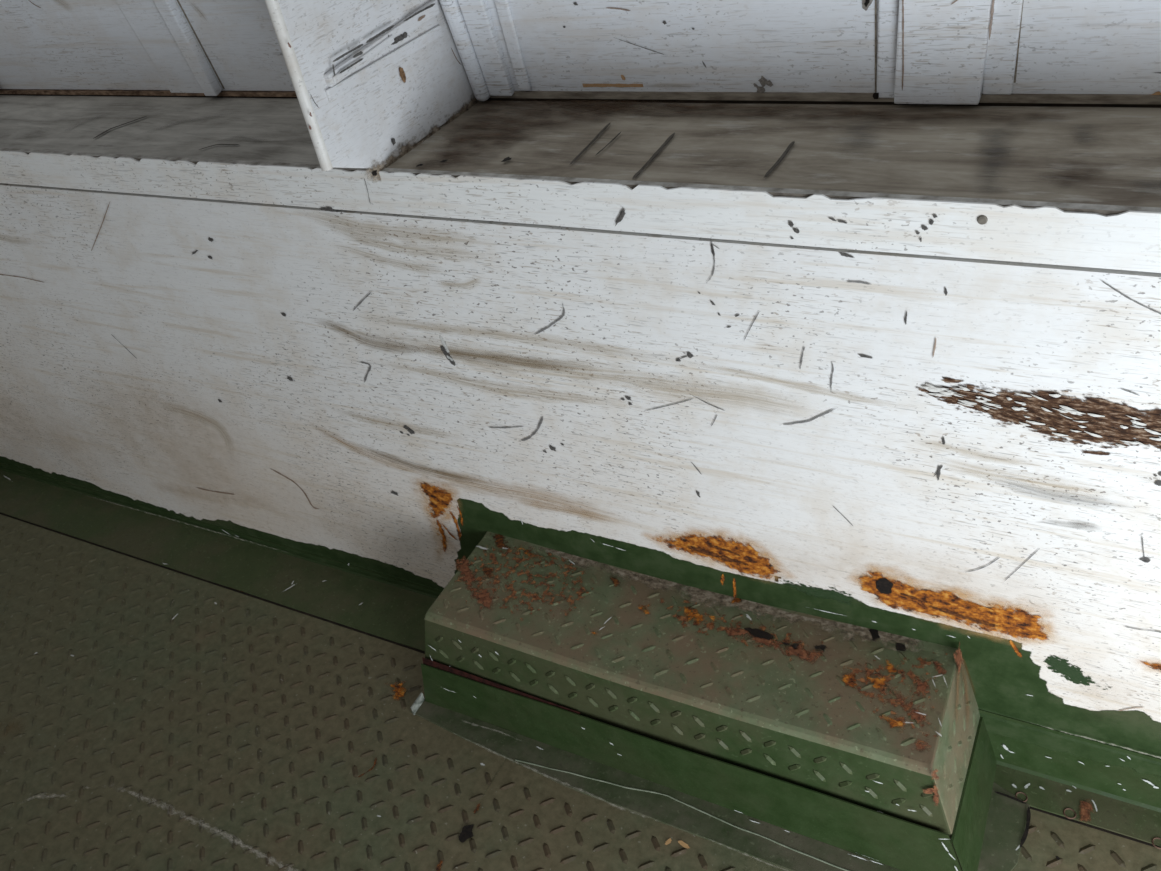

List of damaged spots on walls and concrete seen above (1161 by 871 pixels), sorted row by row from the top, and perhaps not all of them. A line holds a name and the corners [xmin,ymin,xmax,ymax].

corrosion [421,482,463,552]
corrosion [455,532,964,750]
corrosion [856,569,1050,657]